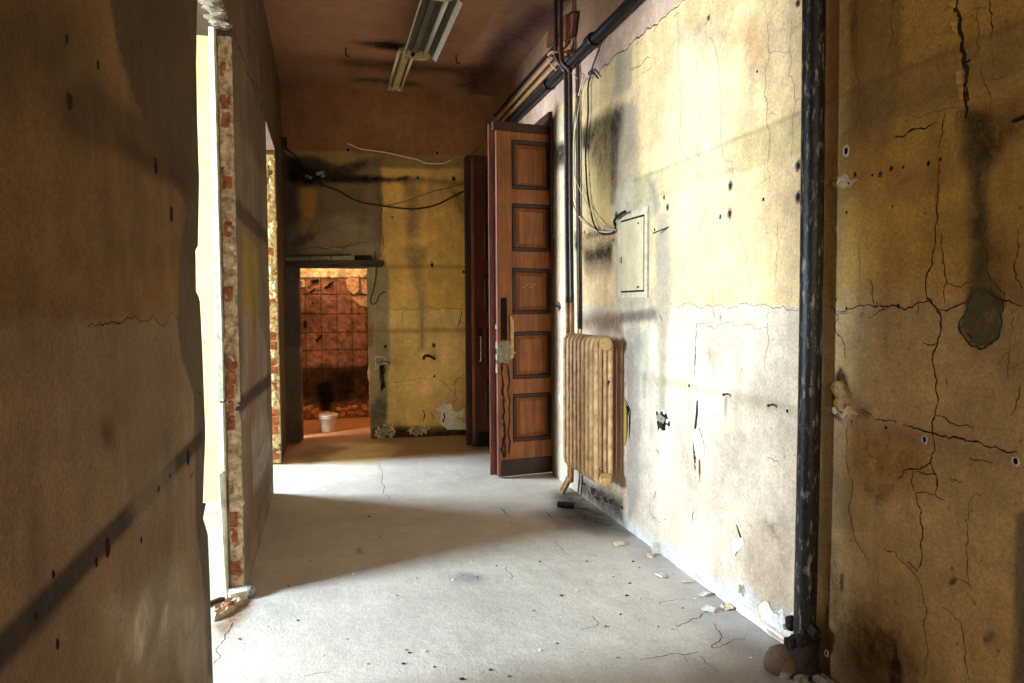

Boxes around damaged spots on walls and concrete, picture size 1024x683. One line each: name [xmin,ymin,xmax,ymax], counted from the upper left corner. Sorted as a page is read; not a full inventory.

crack [585,0,733,177]
crack [760,0,801,184]
leakage [958,112,1012,347]
crack [88,311,177,327]
flaking render [310,276,367,307]
crack [657,222,798,377]
crack [831,0,1023,680]
peeling [409,400,466,436]
spalling [656,410,670,431]
flaking render [826,381,858,425]
flaking render [676,561,793,643]